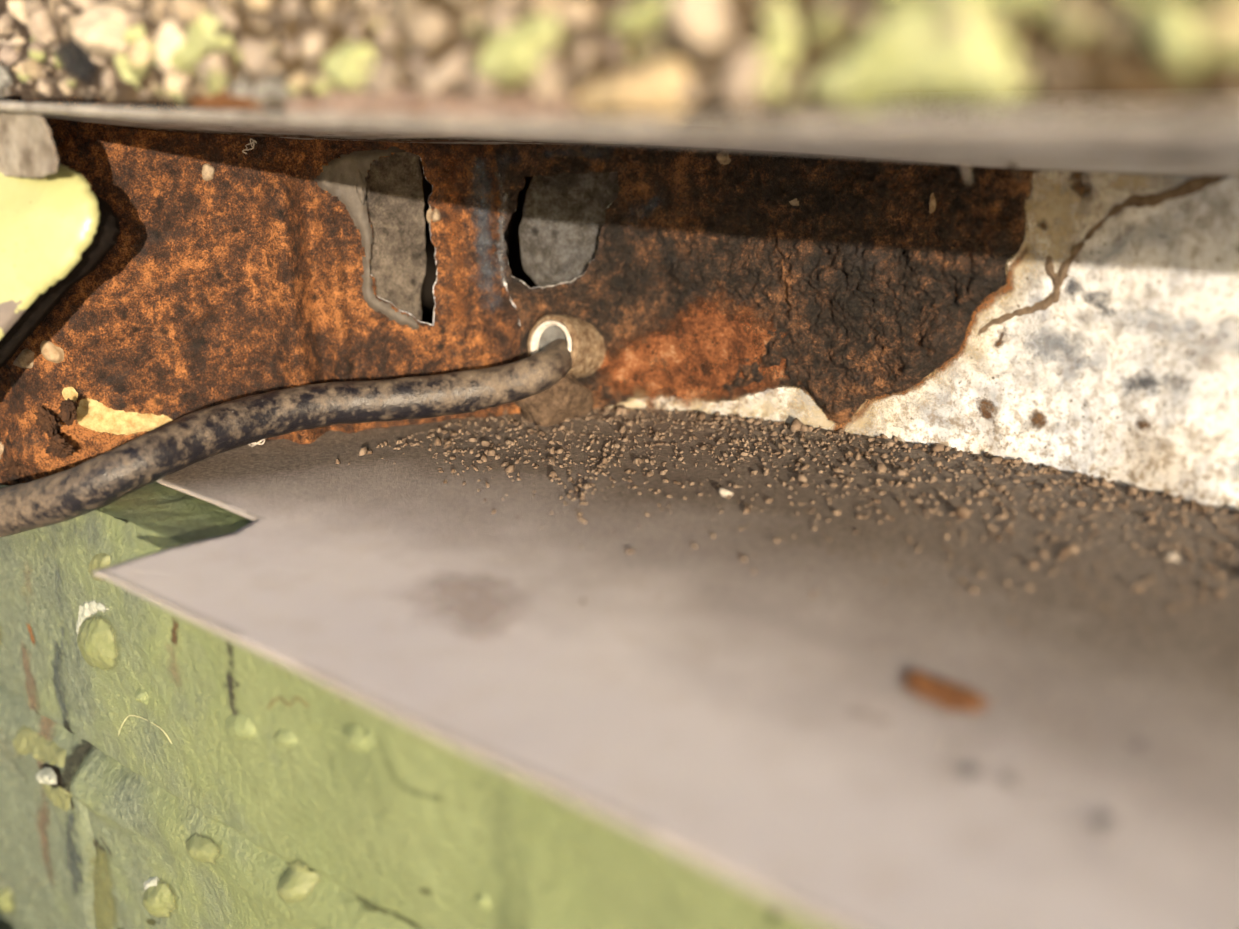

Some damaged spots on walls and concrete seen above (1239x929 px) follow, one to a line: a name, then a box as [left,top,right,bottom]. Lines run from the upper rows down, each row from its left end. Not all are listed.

peeling [314,146,419,330]
corrosion [0,95,1154,486]
crack [978,176,1230,335]
crack [61,716,93,811]